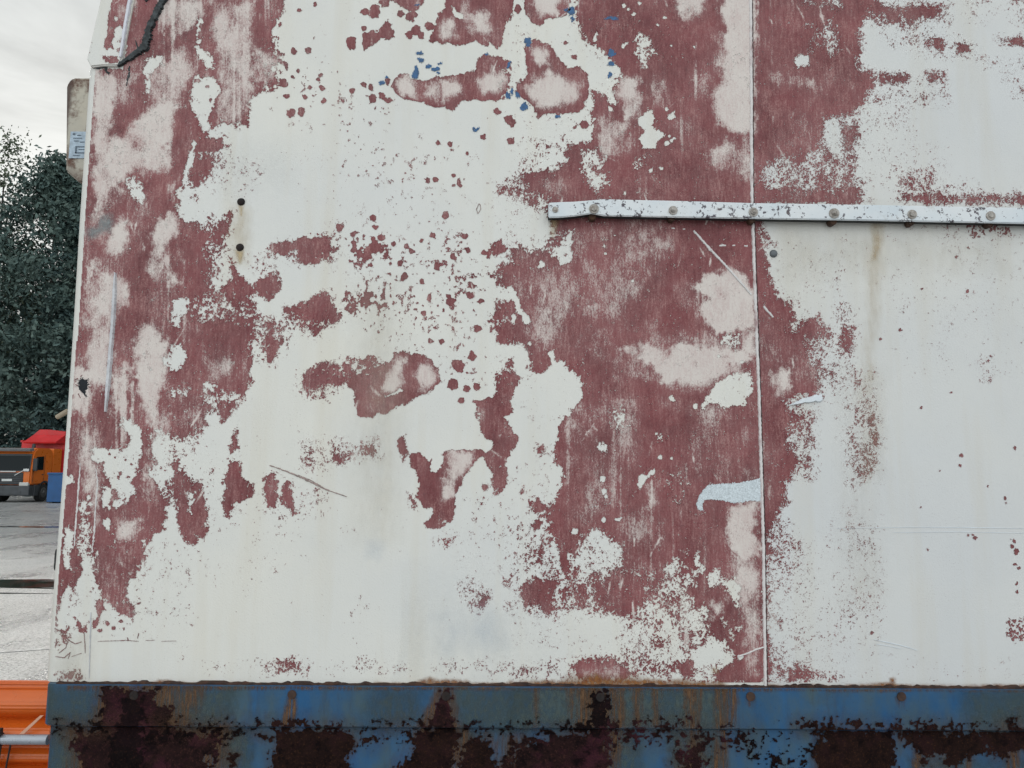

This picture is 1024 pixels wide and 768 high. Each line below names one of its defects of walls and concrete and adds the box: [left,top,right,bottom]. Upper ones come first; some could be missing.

peeling [346,19,395,51]
peeling [999,0,1024,50]
peeling [286,107,313,133]
peeling [386,135,479,215]
peeling [876,146,1024,207]
peeling [936,225,1024,305]
peeling [298,431,385,476]
peeling [219,427,330,537]
peeling [457,570,493,615]
peeling [251,655,314,678]
corrosion [49,674,1024,768]